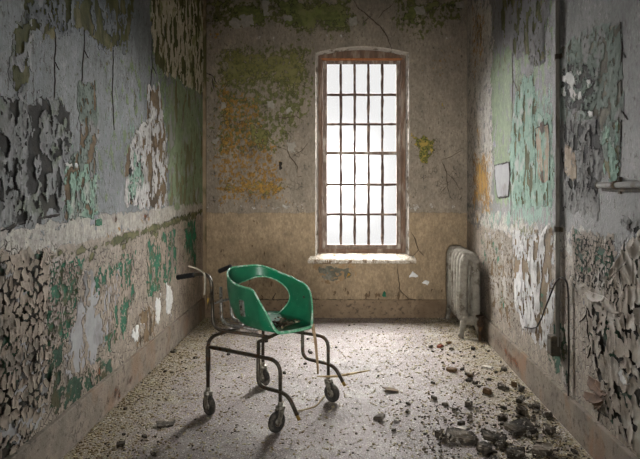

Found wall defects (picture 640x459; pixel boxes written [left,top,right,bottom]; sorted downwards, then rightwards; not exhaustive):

crack [52,34,60,98]
peeling [0,0,136,230]
crack [81,30,89,81]
crack [109,50,117,130]
peeling [124,0,203,211]
leakage [211,0,269,27]
leakage [411,133,435,164]
peeling [494,22,624,221]
peeling [0,228,178,459]
crack [388,264,422,300]
peeling [484,224,568,384]
peeling [570,215,640,455]